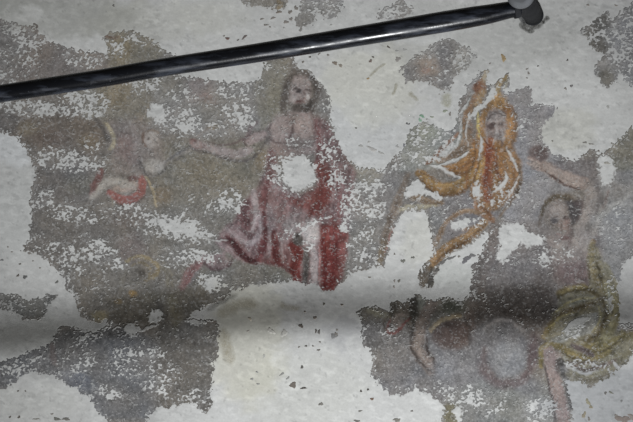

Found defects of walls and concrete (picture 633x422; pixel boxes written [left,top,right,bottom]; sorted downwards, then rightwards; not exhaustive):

peeling [0,19,176,85]
peeling [0,57,393,422]
peeling [387,38,477,95]
peeling [356,69,633,422]